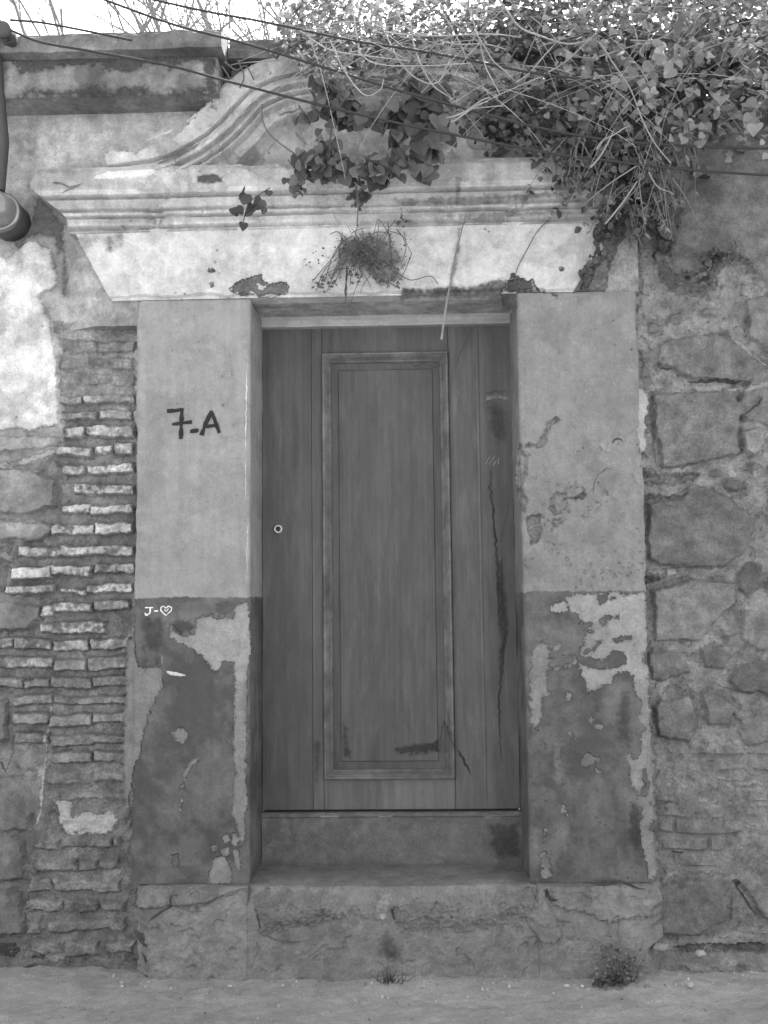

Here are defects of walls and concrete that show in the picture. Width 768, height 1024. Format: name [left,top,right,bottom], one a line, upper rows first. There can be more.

flaking render [229,274,290,299]
flaking render [500,278,546,308]
flaking render [515,417,586,545]
flaking render [0,322,251,968]
peeling [528,591,660,879]
crack [588,880,643,893]
crack [546,888,571,923]